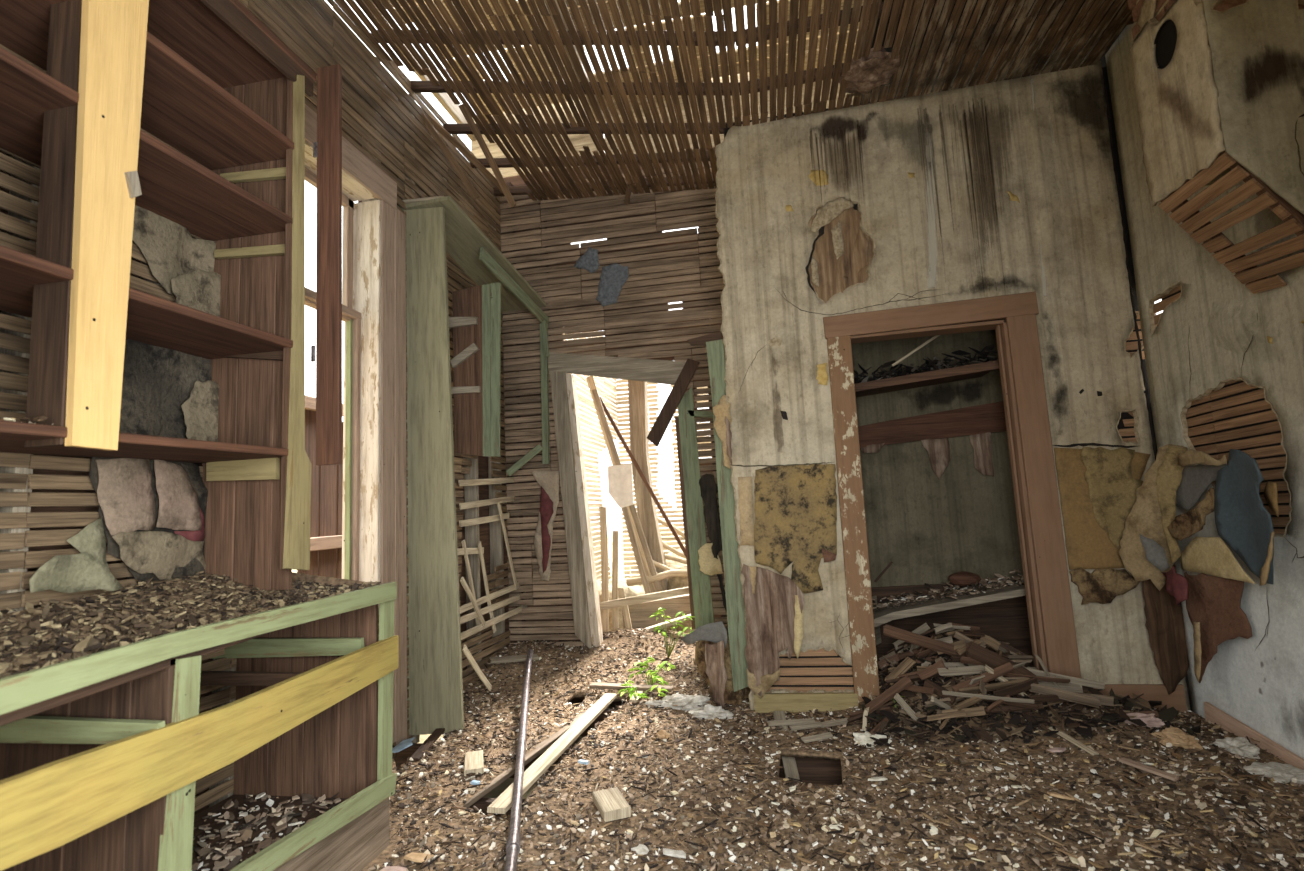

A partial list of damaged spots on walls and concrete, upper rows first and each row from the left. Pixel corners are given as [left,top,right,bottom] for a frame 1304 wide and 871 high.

water stain [821,112,874,140]
water stain [1060,75,1110,153]
crack [1295,114,1304,175]
flaking render [805,170,876,304]
water stain [974,277,1024,290]
flaking render [1124,281,1182,359]
flaking render [1116,409,1141,443]
flaking render [1180,377,1293,537]